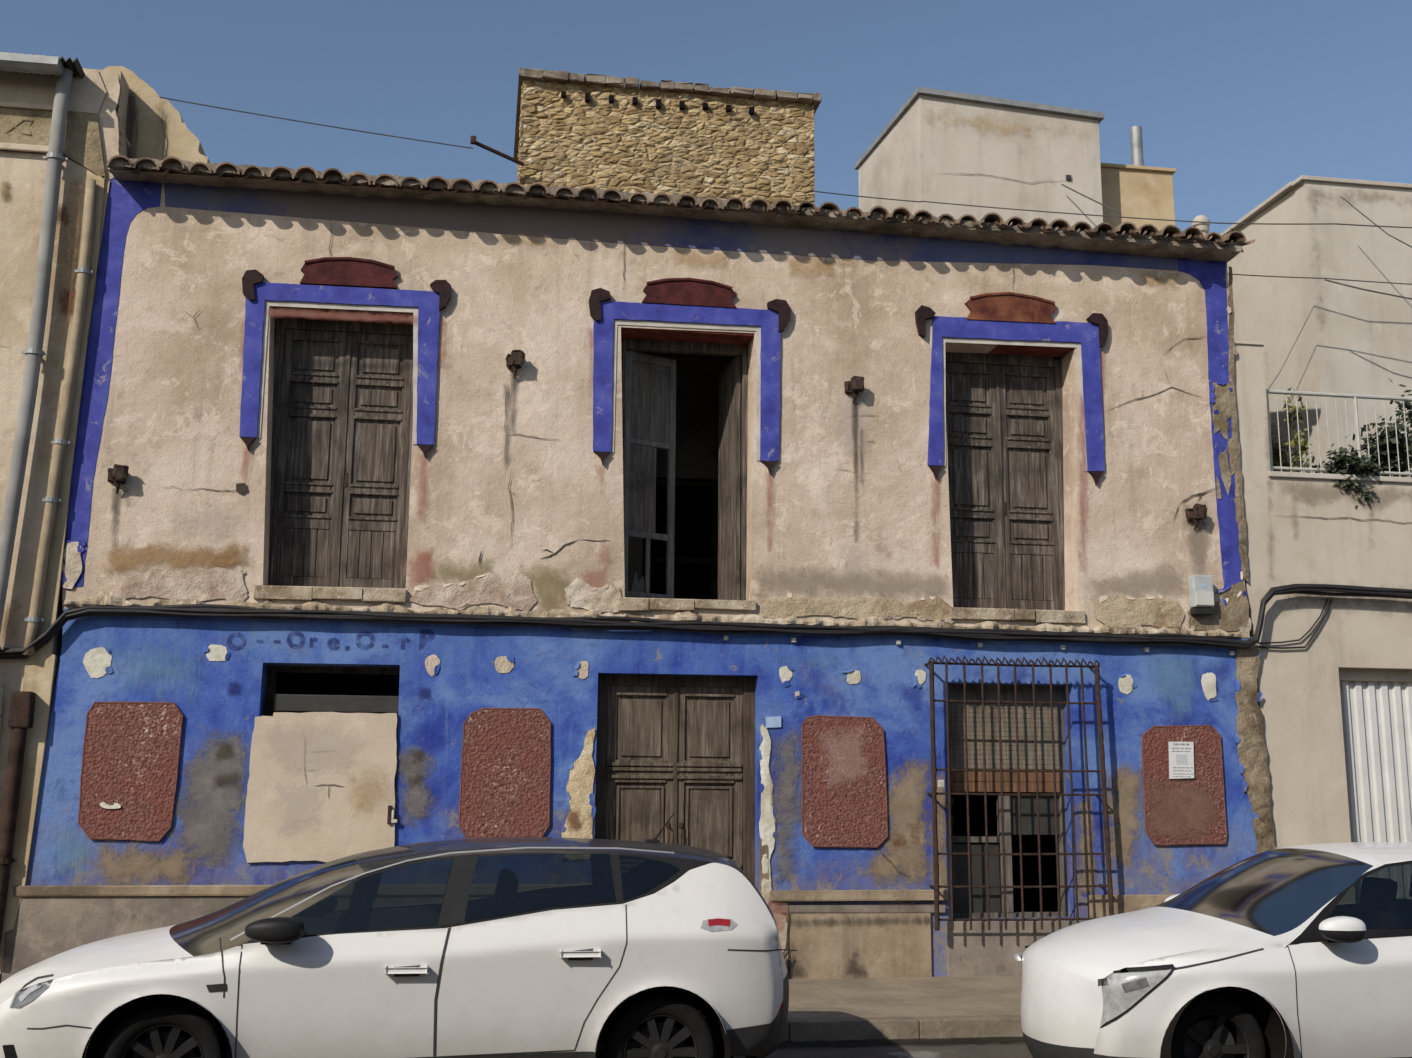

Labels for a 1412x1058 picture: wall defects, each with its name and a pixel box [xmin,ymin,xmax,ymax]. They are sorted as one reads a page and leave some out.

crack [1104,336,1206,412]
crack [504,396,557,440]
peeling [60,539,86,589]
water stain [108,489,240,573]
flaking render [408,572,537,611]
crack [478,469,606,564]
flaking render [563,577,621,614]
flaking render [1094,266,1277,854]
water stain [216,744,237,785]
peeling [560,728,596,839]
peeling [758,715,802,956]